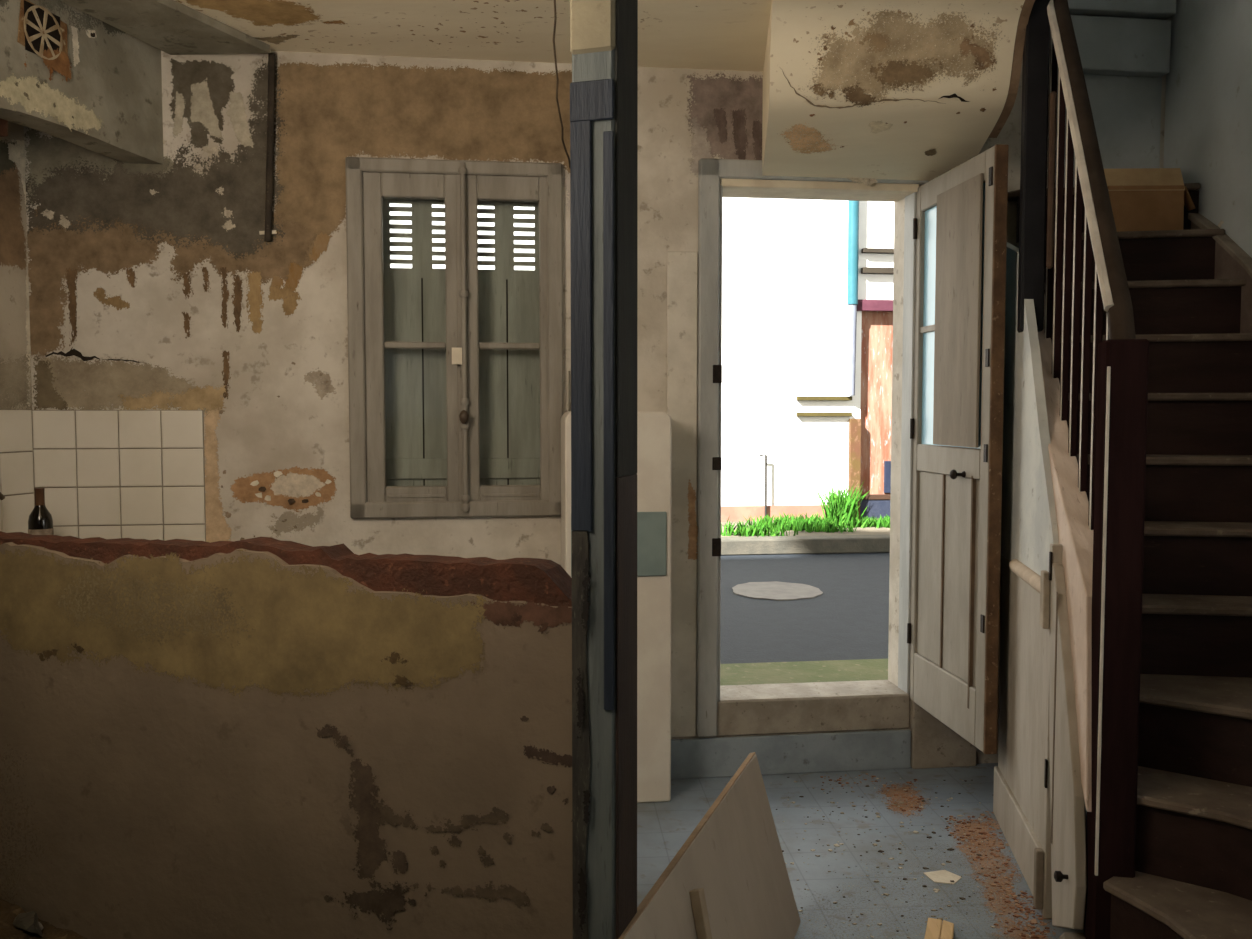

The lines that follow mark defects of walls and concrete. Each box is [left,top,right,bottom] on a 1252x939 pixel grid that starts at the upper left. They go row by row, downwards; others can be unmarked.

peeling [0,73,109,136]
peeling [169,58,255,151]
crack [782,70,970,109]
leakage [801,4,1005,108]
peeling [7,140,31,408]
flaking render [204,396,337,543]